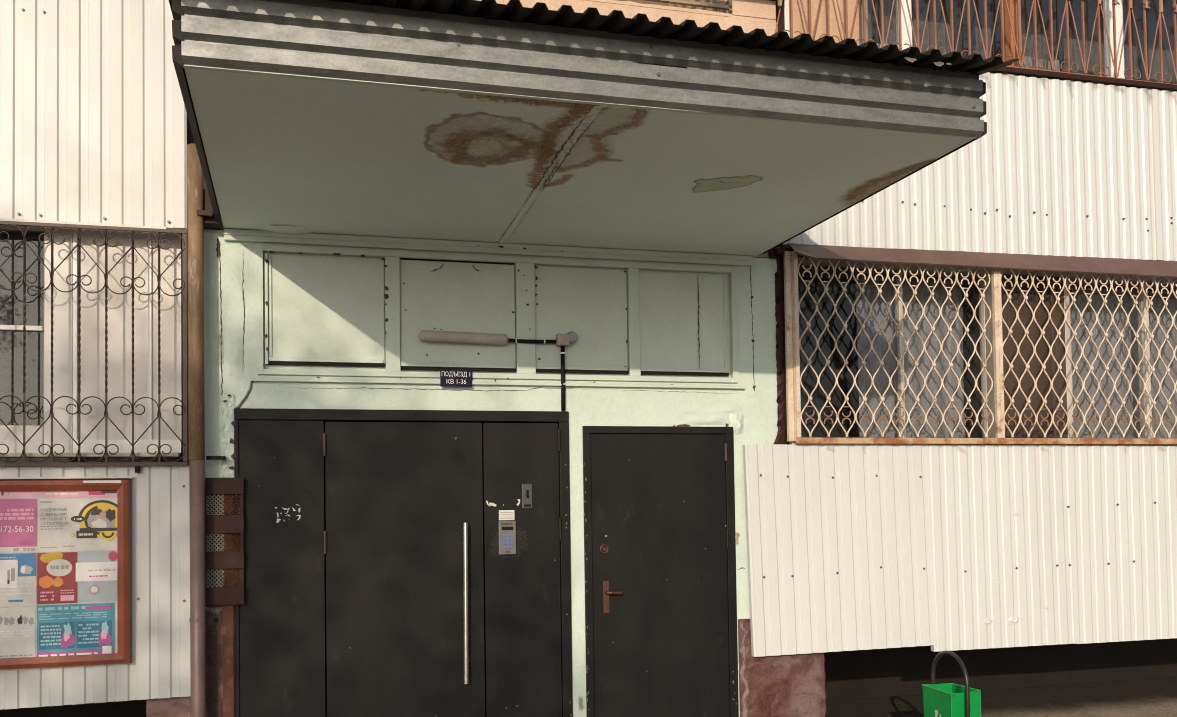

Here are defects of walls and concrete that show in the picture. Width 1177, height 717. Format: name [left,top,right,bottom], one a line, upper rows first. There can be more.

corrosion [421,89,646,188]
crack [499,105,613,243]
peeling [692,175,763,193]
corrosion [847,161,931,203]